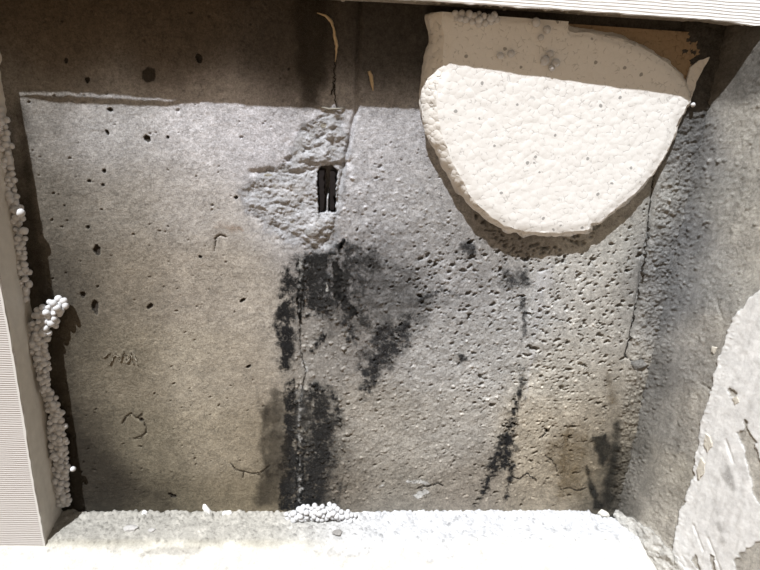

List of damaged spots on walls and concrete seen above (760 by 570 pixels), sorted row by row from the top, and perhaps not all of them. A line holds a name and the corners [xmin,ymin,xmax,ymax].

crack [330,61,338,106]
spalling [234,107,351,251]
crack [299,267,307,398]
damp [272,242,444,392]
crack [624,175,654,361]
damp [258,379,341,511]
damp [473,368,526,506]
damp [586,422,620,509]
flaking render [613,290,760,570]